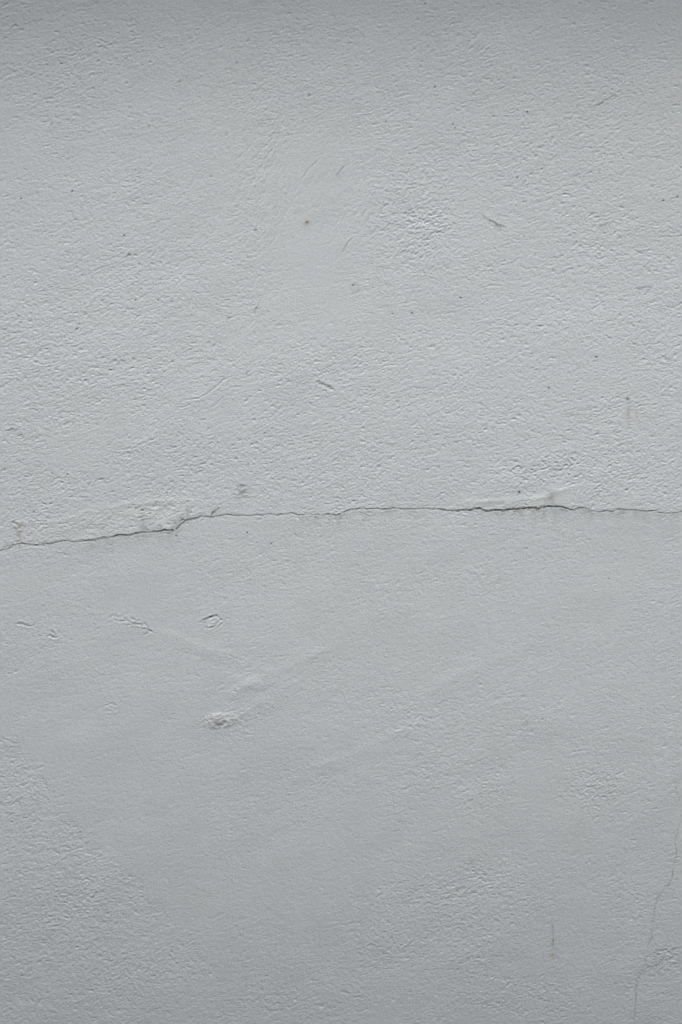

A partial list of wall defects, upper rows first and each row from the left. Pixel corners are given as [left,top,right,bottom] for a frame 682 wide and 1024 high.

crack [0,505,682,551]